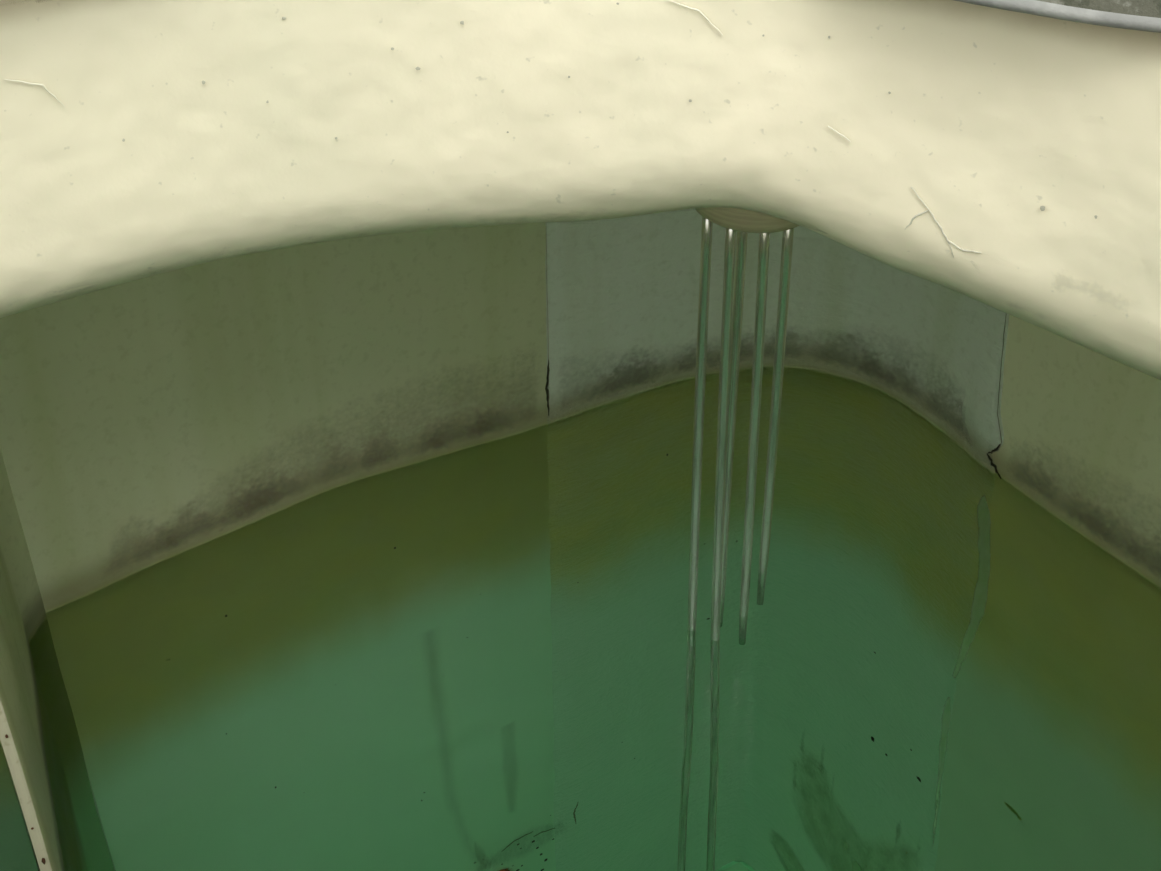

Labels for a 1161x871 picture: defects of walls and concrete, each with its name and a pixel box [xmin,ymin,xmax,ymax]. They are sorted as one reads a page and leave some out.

crack [905,187,981,258]
crack [543,242,551,416]
crack [986,313,1007,479]